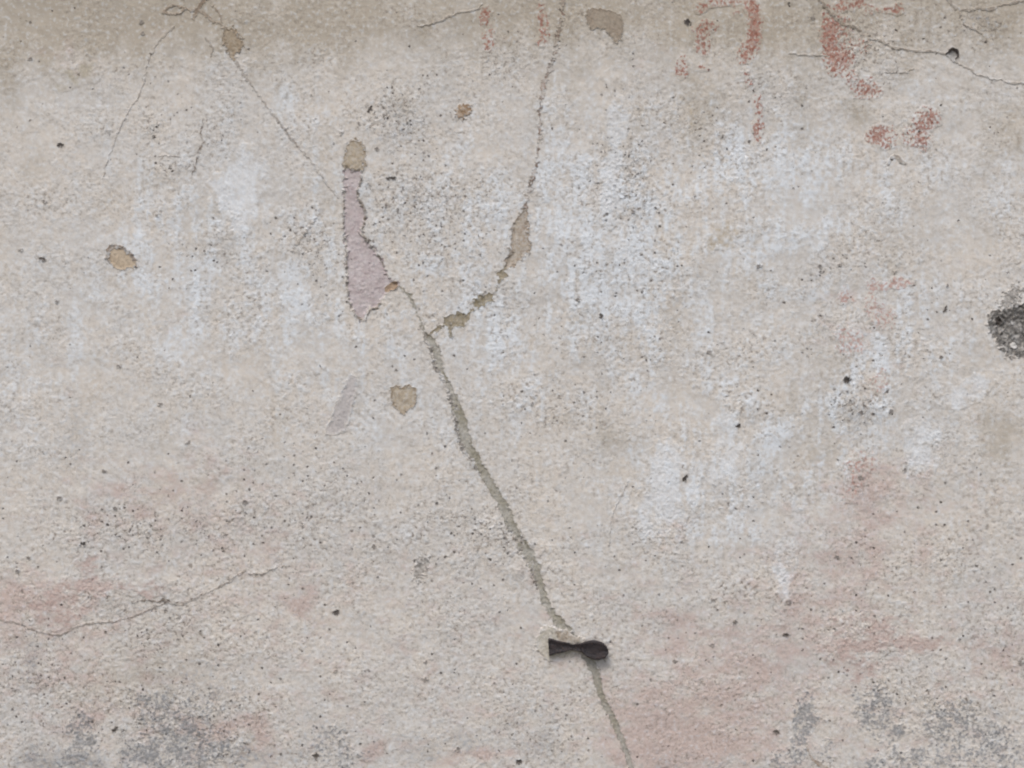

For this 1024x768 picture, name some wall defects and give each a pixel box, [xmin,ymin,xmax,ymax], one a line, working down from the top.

crack [101,0,340,252]
crack [417,3,484,28]
crack [522,0,566,212]
rust [673,0,765,146]
crack [789,50,827,58]
rust [818,0,905,101]
rust [864,104,943,153]
crack [818,0,1024,85]
peeling [341,168,400,324]
spalling [503,207,532,270]
crack [398,253,635,768]
crack [0,565,291,637]